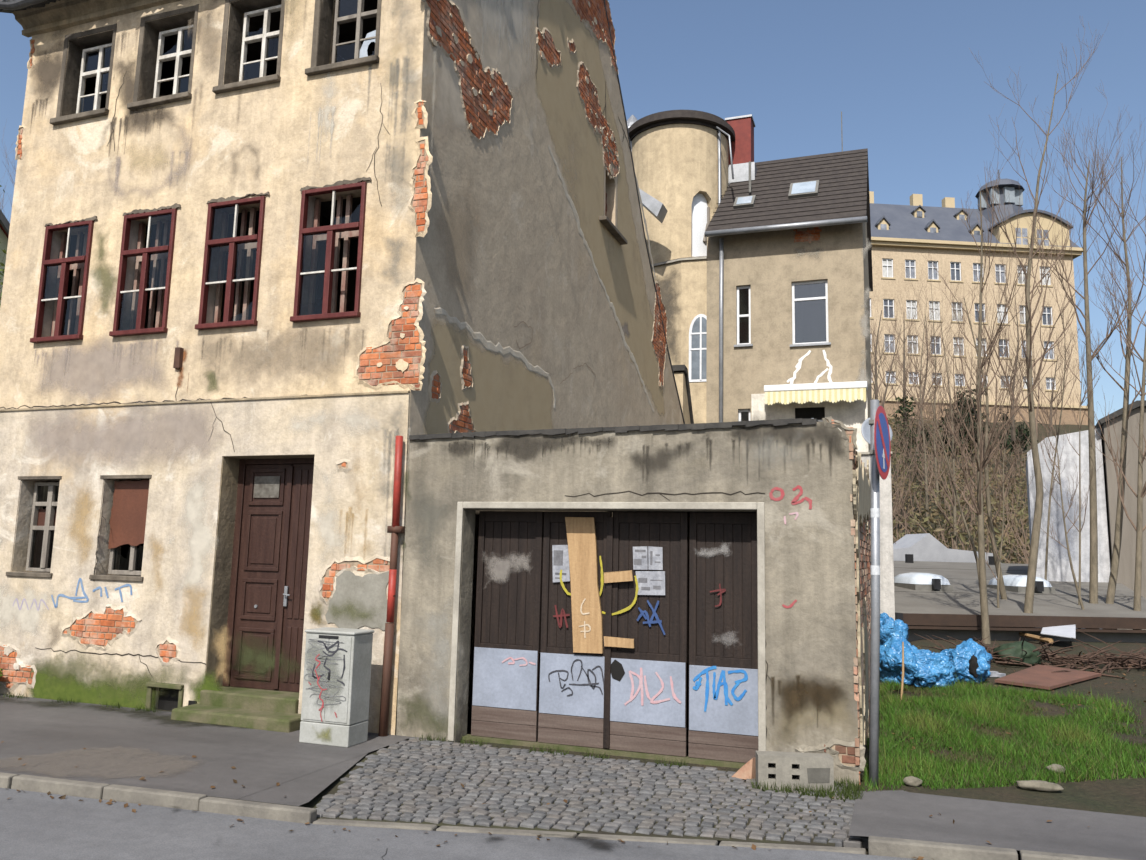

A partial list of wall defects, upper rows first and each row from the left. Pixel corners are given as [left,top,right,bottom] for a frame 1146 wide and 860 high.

damp [31,53,62,121]
flaking render [422,0,513,142]
crack [366,83,390,206]
flaking render [407,100,433,237]
flaking render [353,278,442,404]
damp [449,434,613,459]
damp [634,444,689,468]
flaking render [61,604,141,651]
flaking render [318,554,390,606]
flaking render [795,416,871,780]
flaking render [0,642,37,692]
damp [772,676,842,716]